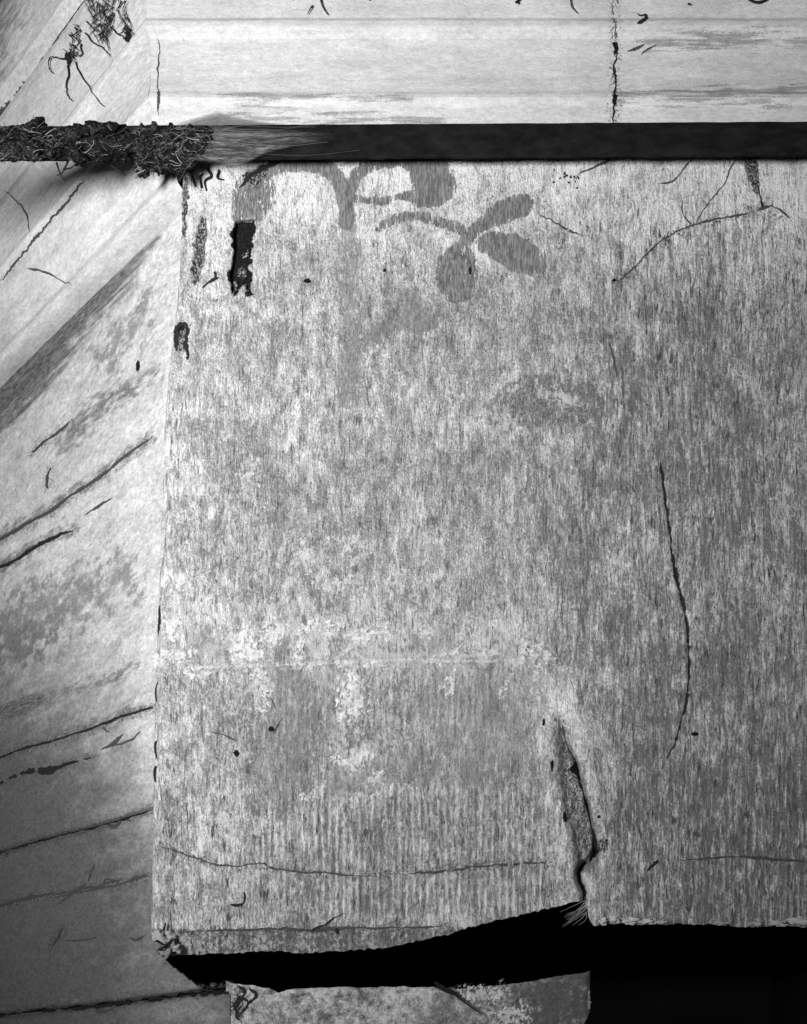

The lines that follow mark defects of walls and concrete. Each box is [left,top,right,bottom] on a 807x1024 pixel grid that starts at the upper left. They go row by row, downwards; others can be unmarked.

crack [606,0,656,122]
spalling [227,221,256,297]
crack [612,158,792,290]
peeling [173,322,190,355]
crack [657,439,691,777]
crack [0,840,557,951]
crack [647,855,807,871]